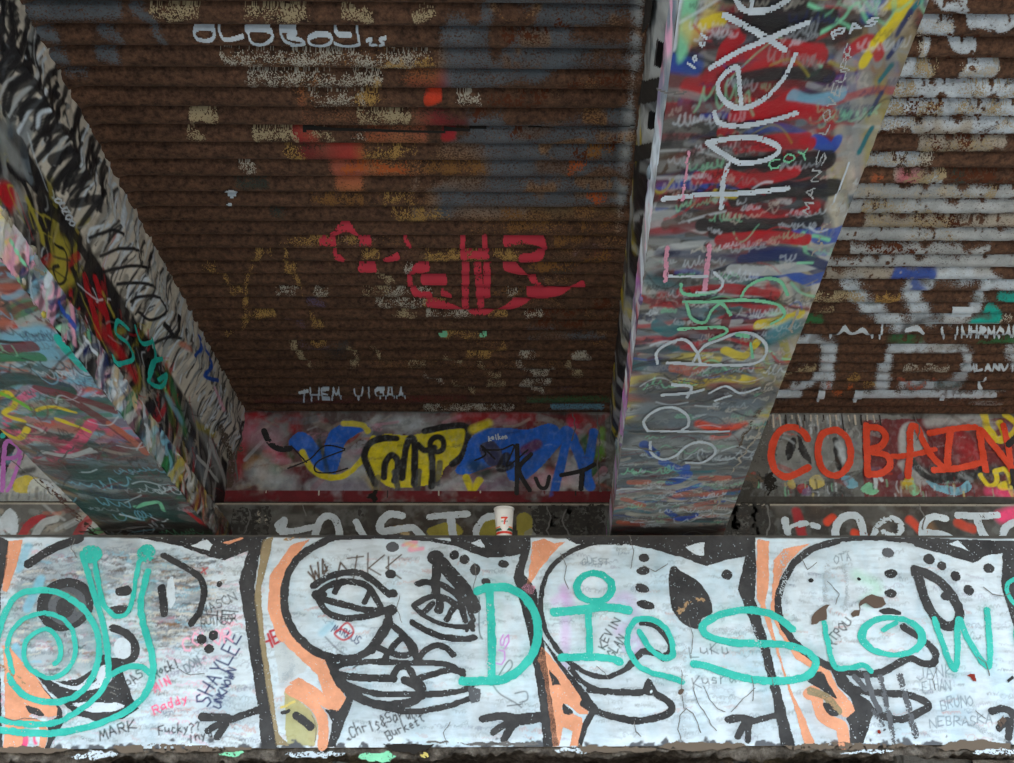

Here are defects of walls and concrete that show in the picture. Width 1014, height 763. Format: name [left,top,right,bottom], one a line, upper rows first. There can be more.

rust [900,98,944,116]
rust [931,133,985,152]
rust [341,160,414,177]
rust [912,213,961,228]
rust [865,241,917,256]
spalling [0,746,74,754]
spalling [111,744,251,753]